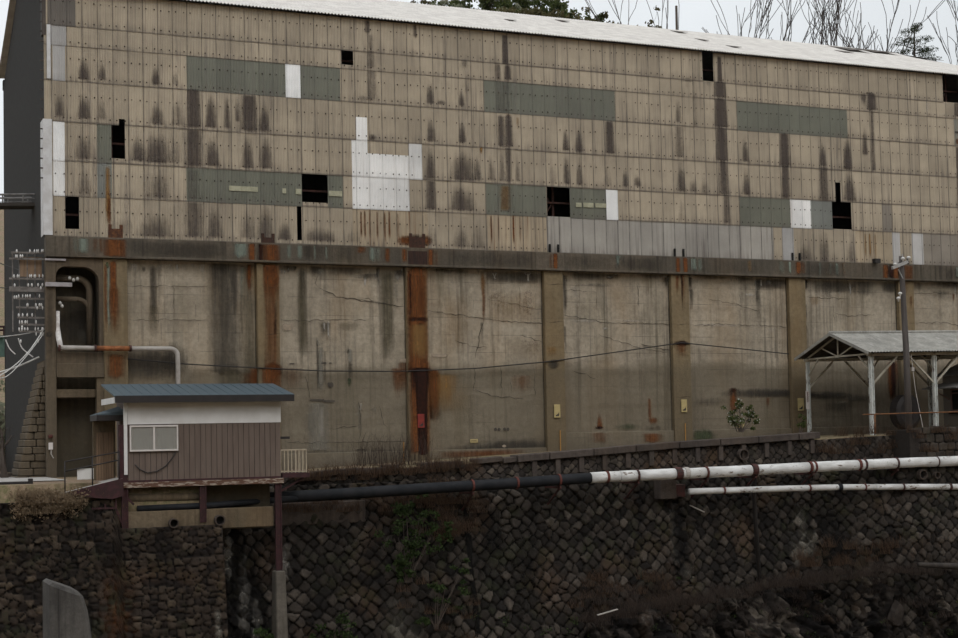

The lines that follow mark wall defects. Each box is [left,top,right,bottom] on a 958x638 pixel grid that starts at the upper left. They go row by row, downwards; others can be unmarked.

leakage [188,89,269,168]
leakage [427,158,435,209]
leakage [499,116,513,182]
leakage [715,57,728,222]
leakage [781,134,789,198]
leakage [844,145,854,201]
leakage [862,93,876,169]
rust [104,239,125,326]
rust [247,244,281,385]
leakage [262,217,331,352]
rust [360,211,451,455]
crack [267,276,782,399]